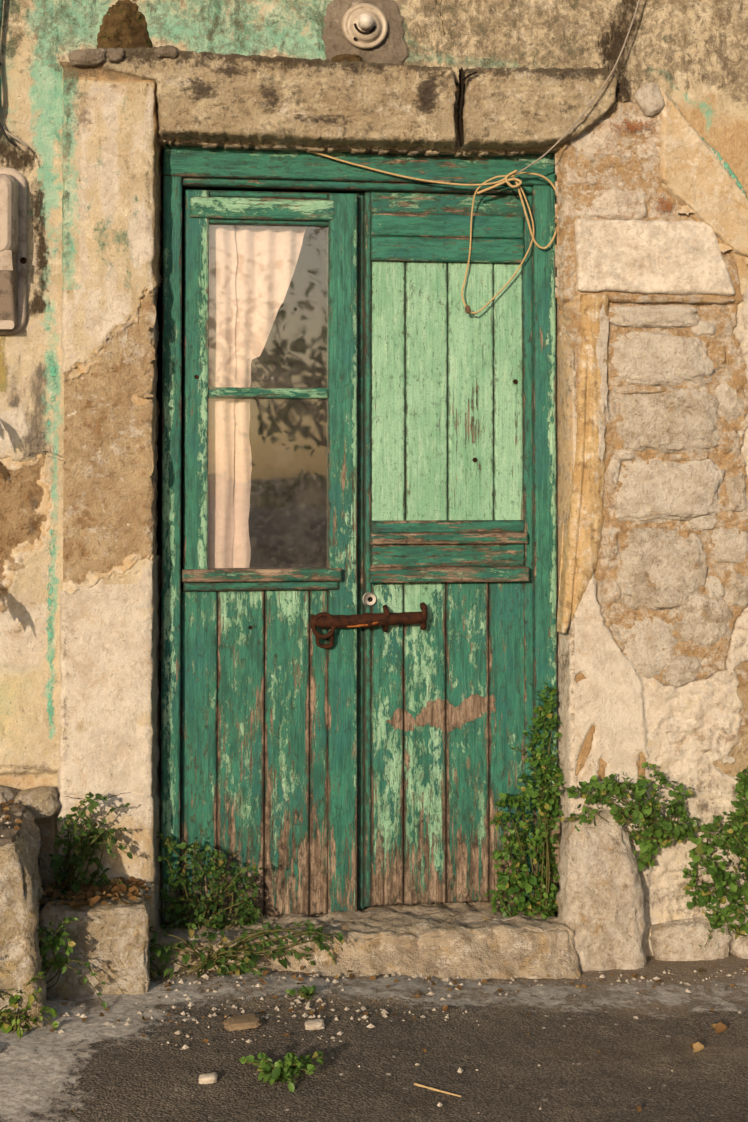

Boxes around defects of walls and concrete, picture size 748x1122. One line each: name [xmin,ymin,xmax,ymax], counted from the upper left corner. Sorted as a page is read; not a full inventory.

crack [457,68,478,148]
flaking render [555,82,748,307]
flaking render [0,287,160,612]
flaking render [573,725,607,782]
flaking render [634,752,646,779]
flaking render [713,654,748,783]